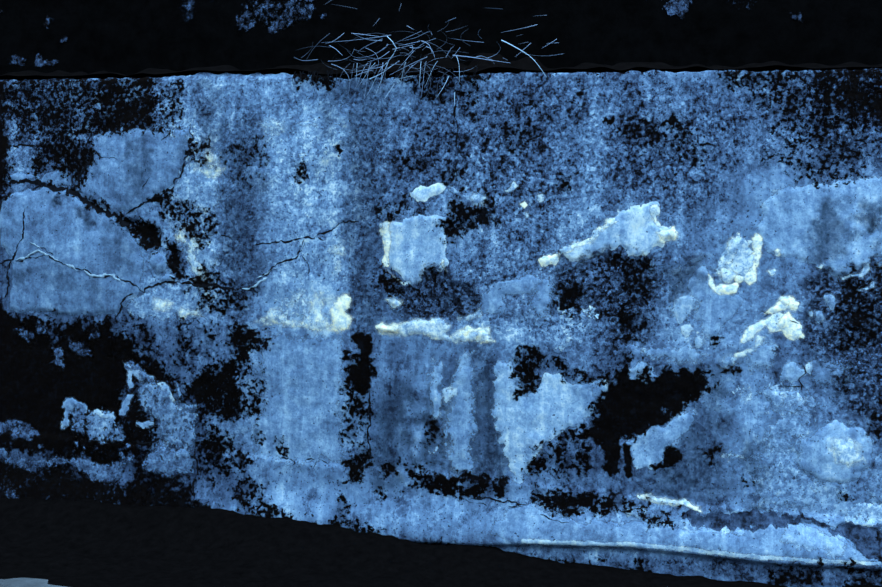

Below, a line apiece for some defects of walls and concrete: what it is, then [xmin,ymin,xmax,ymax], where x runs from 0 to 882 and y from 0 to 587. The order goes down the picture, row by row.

crack [0,111,194,227]
crack [0,208,360,317]
damp [0,189,805,540]
peeling [426,349,479,477]
spalling [371,165,744,384]
peeling [490,176,882,570]
damp [808,294,836,323]
damp [842,261,882,291]
damp [619,558,652,572]